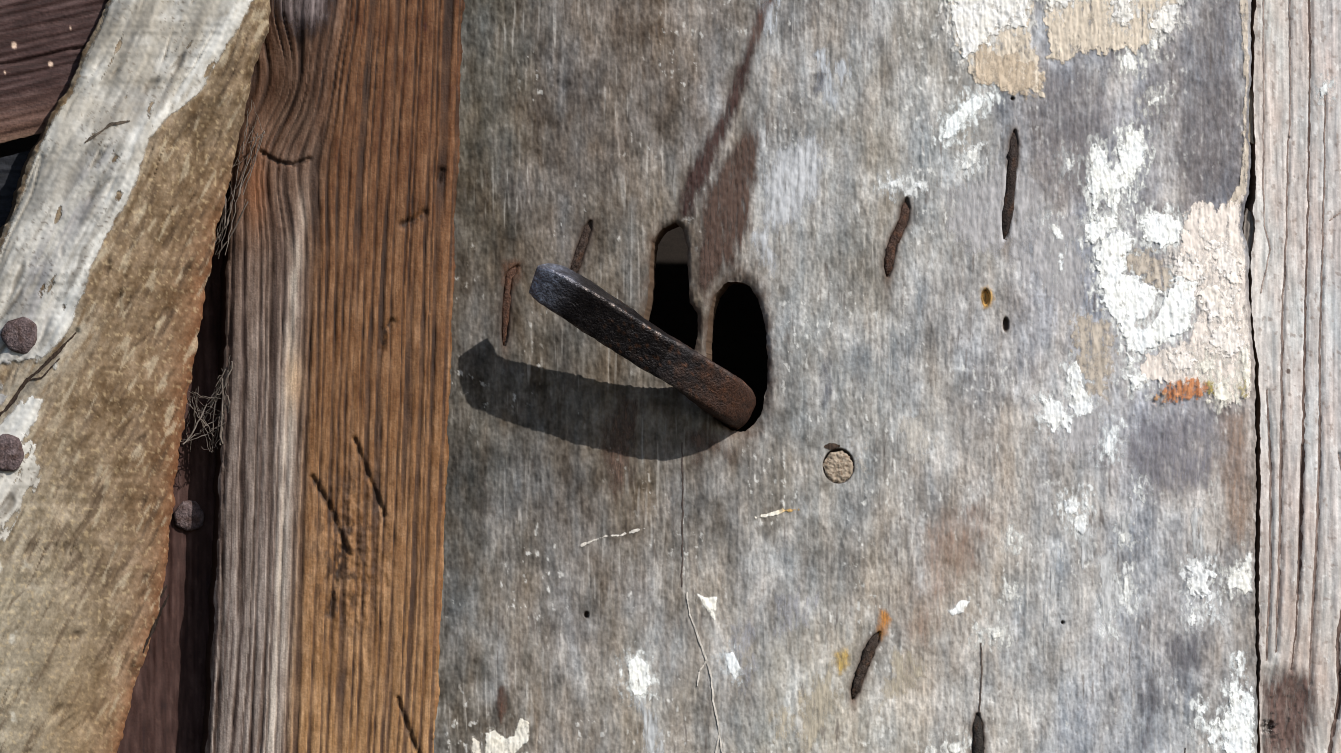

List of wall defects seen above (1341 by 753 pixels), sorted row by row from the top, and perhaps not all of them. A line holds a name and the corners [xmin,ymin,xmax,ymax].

corrosion [681,0,771,294]
peeling [873,169,929,203]
peeling [931,0,1251,414]
corrosion [1154,377,1214,403]
crack [1260,0,1341,753]
peeling [471,718,529,753]